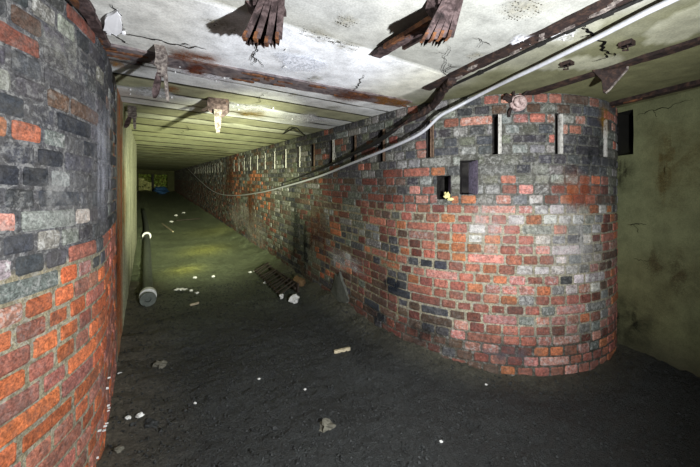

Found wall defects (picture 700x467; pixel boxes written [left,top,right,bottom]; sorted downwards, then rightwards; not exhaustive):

peeling [103,9,126,36]
crack [581,26,616,62]
rust [232,72,293,87]
rust [334,92,407,107]